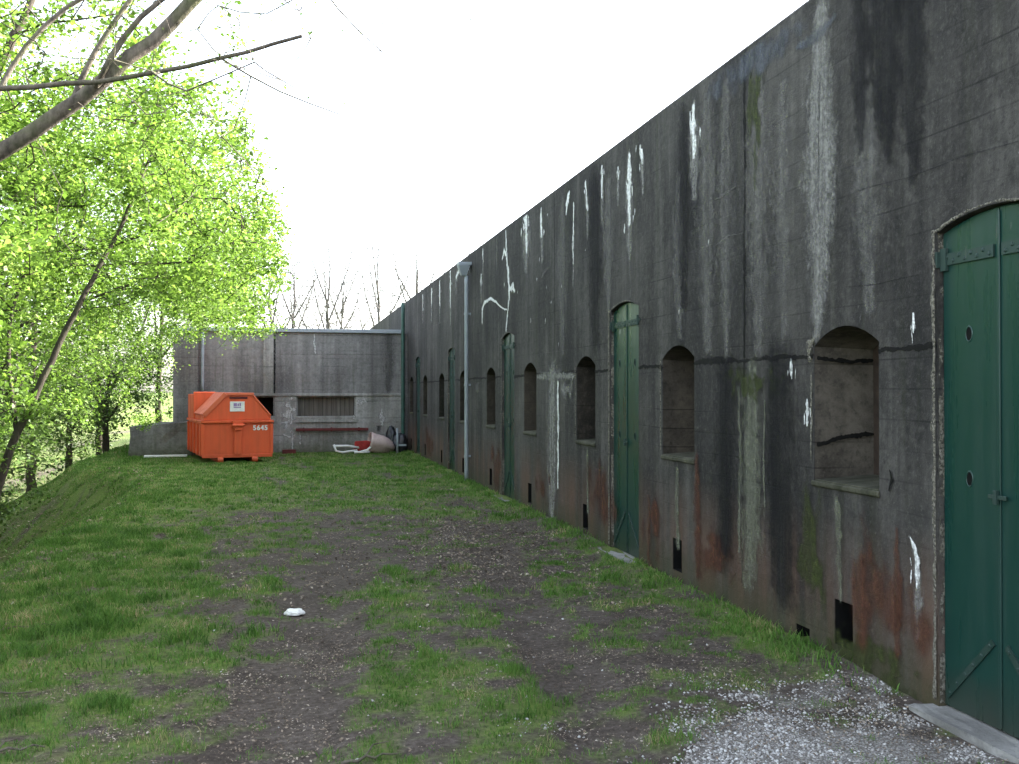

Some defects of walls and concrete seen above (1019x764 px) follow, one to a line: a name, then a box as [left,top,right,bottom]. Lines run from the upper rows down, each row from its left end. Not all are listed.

damp [853,0,926,181]
damp [482,232,515,330]
damp [521,208,545,272]
damp [561,144,644,328]
damp [673,102,729,323]
damp [715,290,796,603]
damp [910,538,922,626]